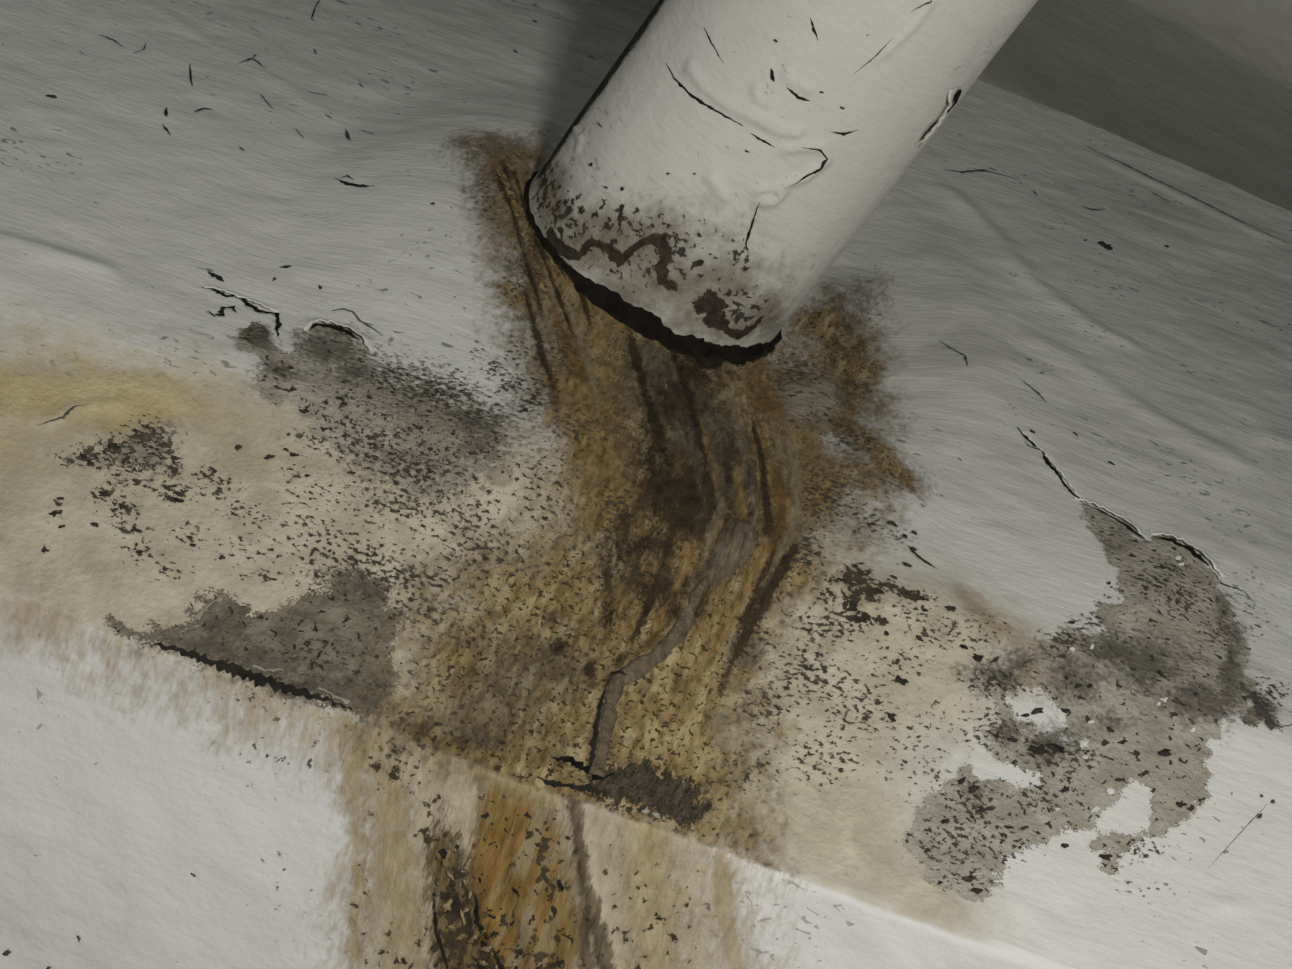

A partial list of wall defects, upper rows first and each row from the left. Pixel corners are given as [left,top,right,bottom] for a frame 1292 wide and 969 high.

crack [666,63,857,187]
crack [203,271,282,343]
crack [332,308,382,335]
peeling [546,226,678,291]
peeling [604,186,625,227]
damp [0,349,595,738]
peeling [49,237,679,732]
corrosion [201,129,914,969]
crack [1017,426,1086,502]
peeling [713,342,1292,904]
damp [689,516,1015,926]
peeling [537,754,715,831]